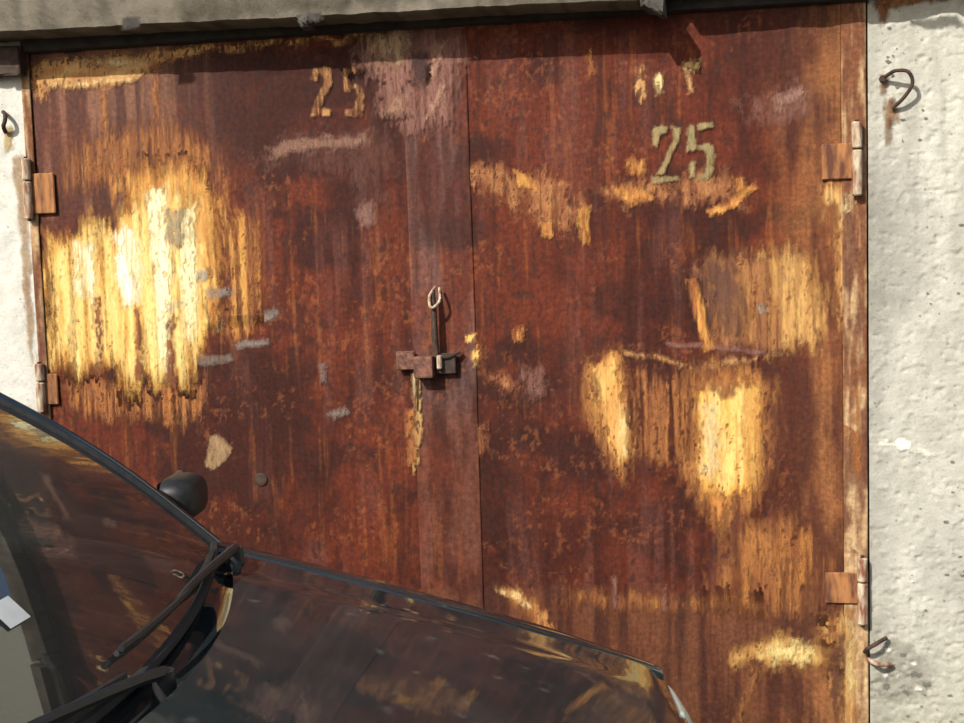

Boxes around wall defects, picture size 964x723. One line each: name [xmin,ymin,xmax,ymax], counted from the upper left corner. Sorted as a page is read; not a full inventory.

rust [874,0,942,23]
rust [881,77,898,141]
rust [62,96,260,342]
rust [465,334,481,360]
rust [60,368,208,433]
rust [489,367,544,395]
rust [846,390,862,478]
rust [566,344,836,620]
rust [501,587,554,629]